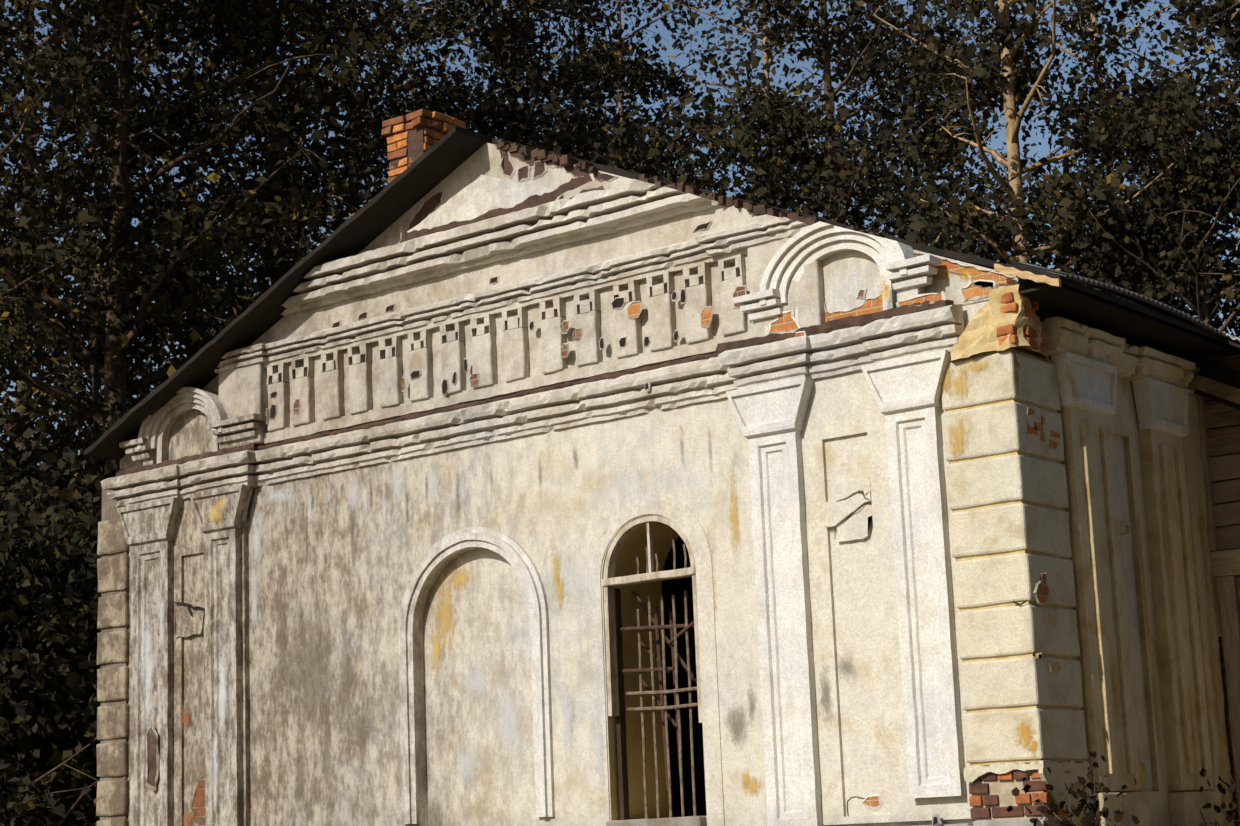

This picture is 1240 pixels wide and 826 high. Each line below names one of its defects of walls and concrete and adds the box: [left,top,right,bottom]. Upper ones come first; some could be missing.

flaking render [398,145,618,244]
flaking render [769,310,806,352]
spalling [823,259,1049,363]
flaking render [1026,406,1061,448]
flaking render [824,477,872,542]
flaking render [1033,570,1050,606]
spalling [964,760,1095,826]